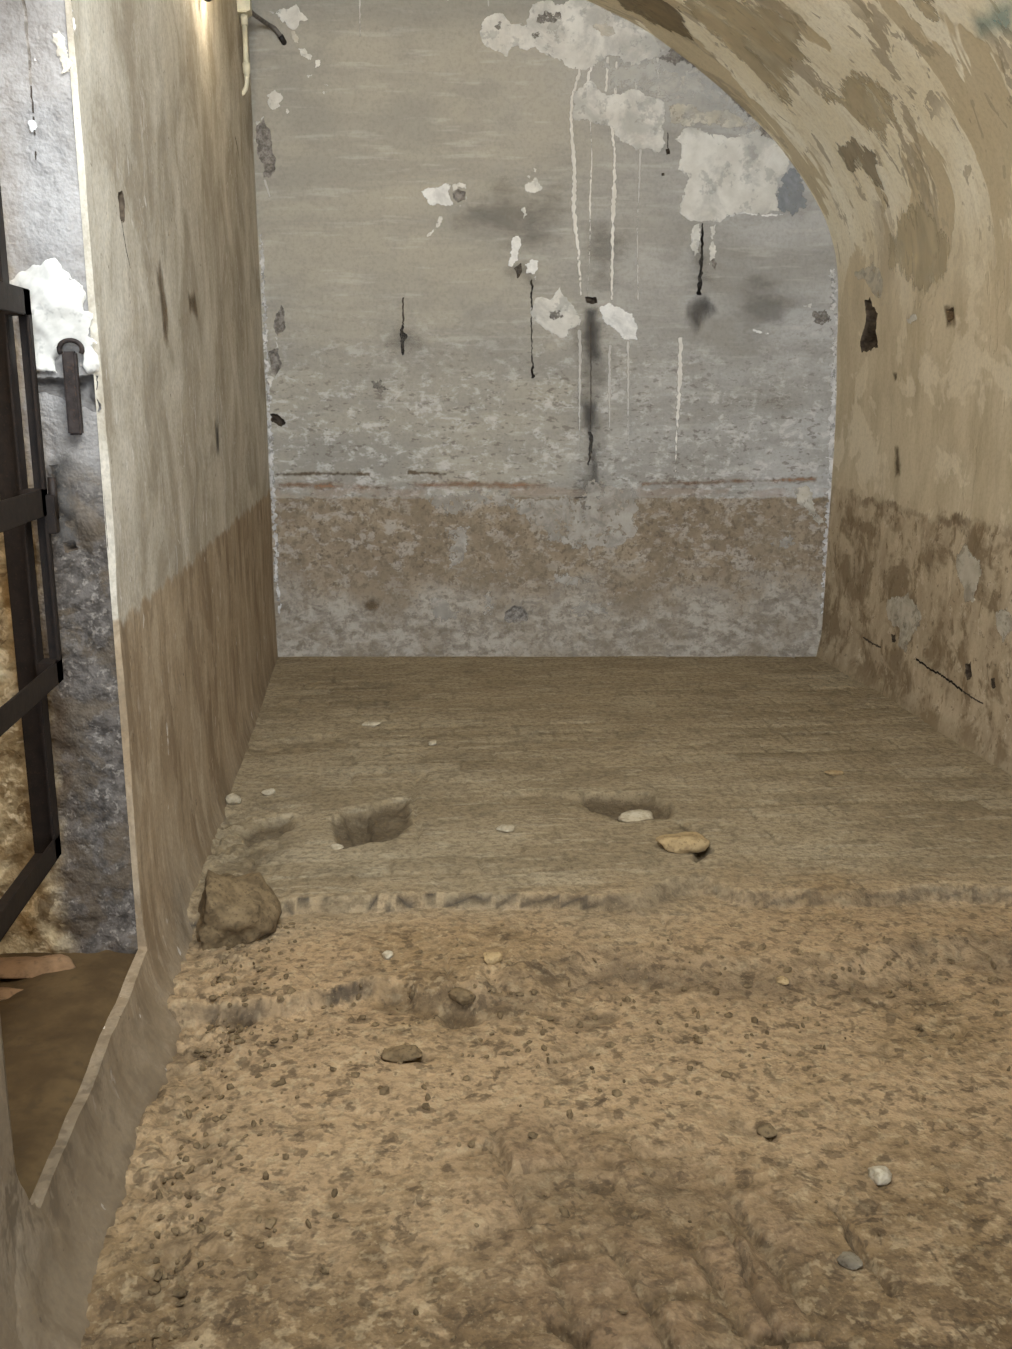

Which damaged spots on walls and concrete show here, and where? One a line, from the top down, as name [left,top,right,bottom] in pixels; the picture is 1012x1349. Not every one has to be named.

flaking render [915,0,939,22]
flaking render [421,182,468,237]
damp [569,57,618,296]
flaking render [480,0,811,264]
flaking render [9,258,100,375]
flaking render [508,236,597,378]
damp [575,311,630,510]
crack [916,658,983,704]